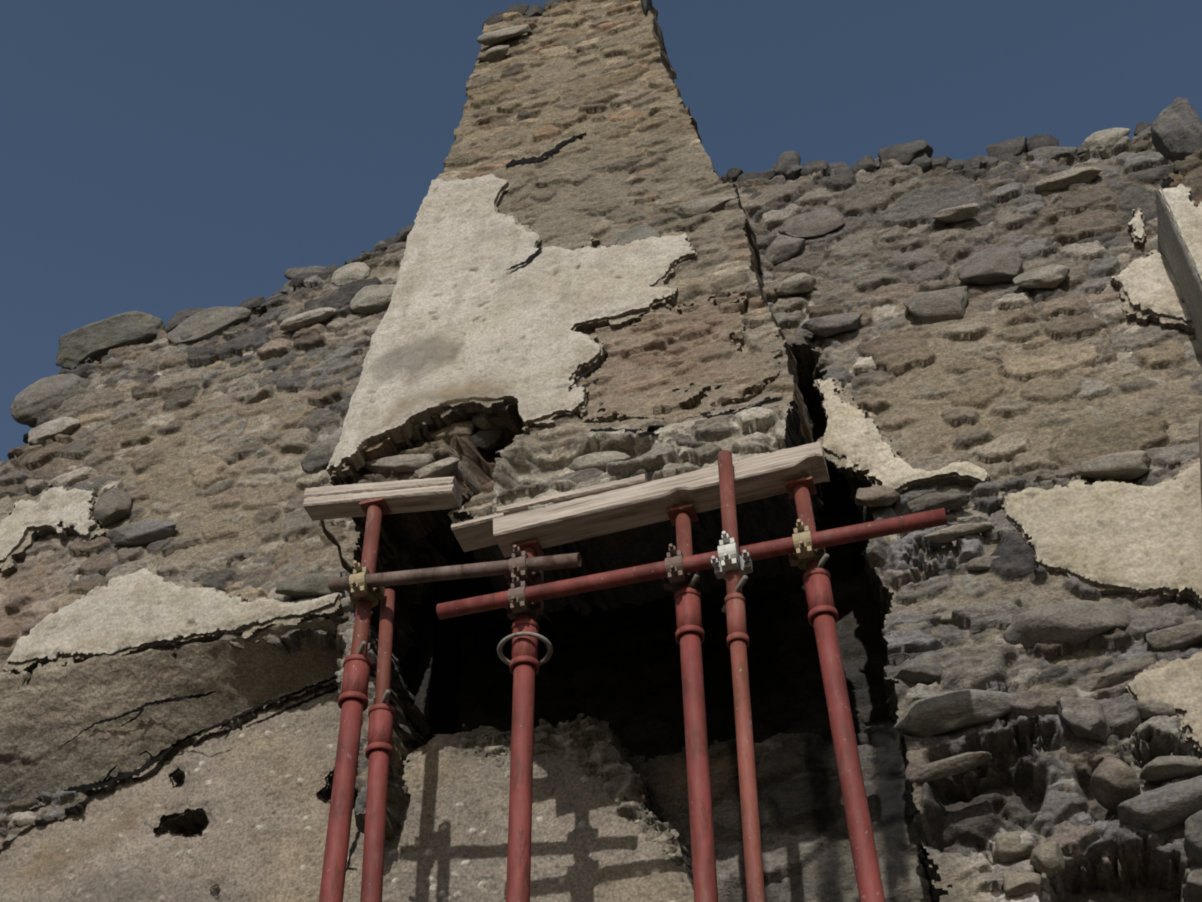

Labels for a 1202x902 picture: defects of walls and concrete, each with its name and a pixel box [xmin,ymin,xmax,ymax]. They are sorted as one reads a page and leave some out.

flaking render [326,173,783,480]
flaking render [1110,207,1195,335]
flaking render [0,483,106,575]
flaking render [813,376,1202,611]
flaking render [3,563,344,674]
spalling [153,808,209,837]
crack [35,676,338,801]
spalling [316,769,334,802]
crack [346,831,360,870]